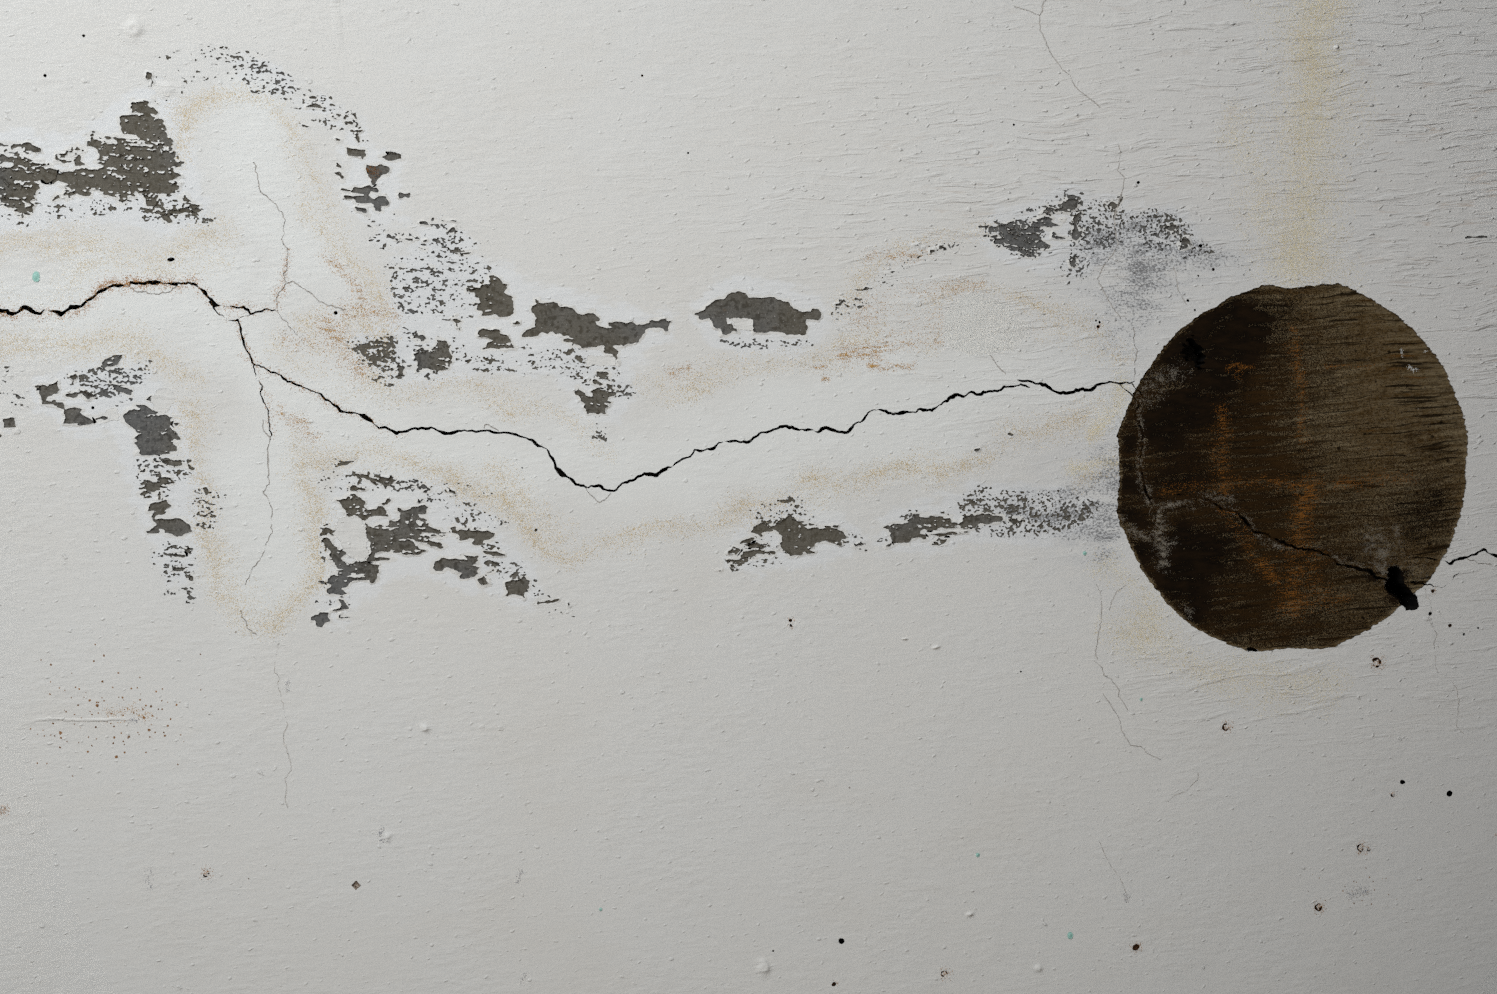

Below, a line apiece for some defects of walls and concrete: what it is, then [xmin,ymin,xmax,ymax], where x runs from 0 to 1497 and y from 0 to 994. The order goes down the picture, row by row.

peeling [0,351,227,604]
peeling [0,46,673,442]
peeling [308,457,575,630]
leakage [0,0,1464,720]
crack [0,145,1497,808]
peeling [692,189,1215,349]
peeling [714,259,1469,652]